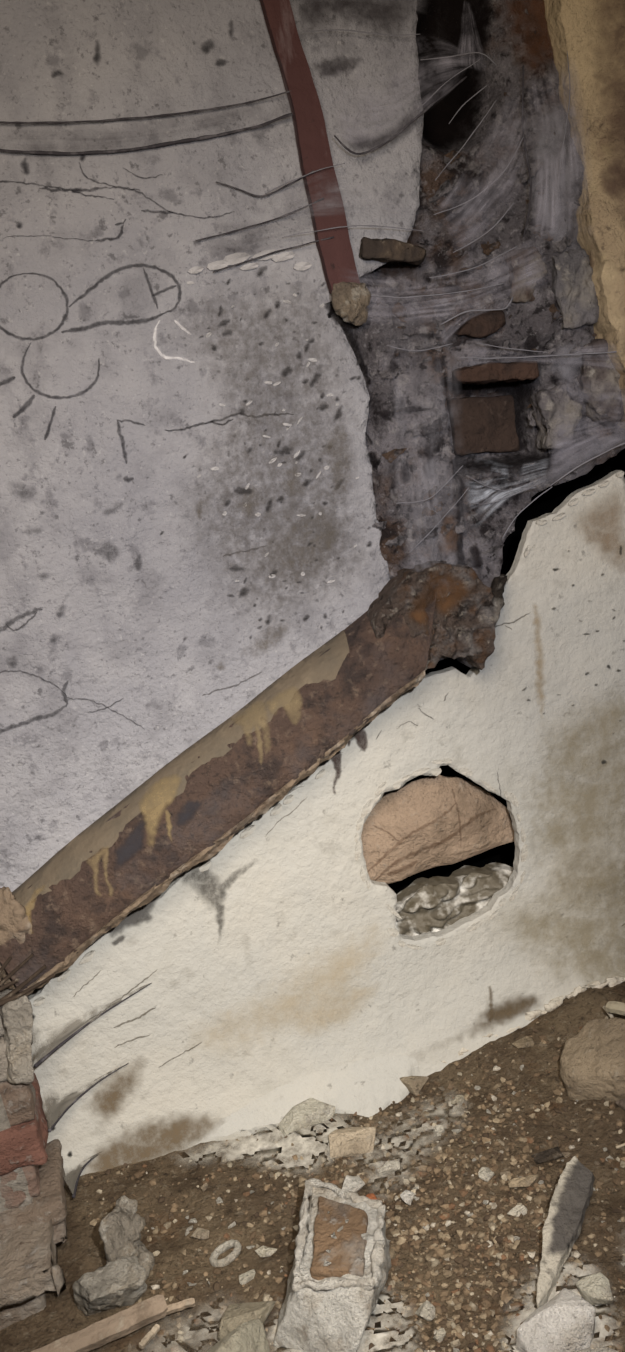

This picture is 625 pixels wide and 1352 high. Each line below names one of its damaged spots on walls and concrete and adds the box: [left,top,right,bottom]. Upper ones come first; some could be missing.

spalling [187,249,312,321]
spalling [264,339,341,419]
spalling [262,409,331,486]
spalling [222,483,283,517]
flaking render [535,471,624,525]
crack [5,608,42,631]
crack [0,670,137,732]
corrosion [331,728,367,793]
corrosion [141,778,177,842]
flaking render [355,758,528,932]
water stain [441,967,625,1063]